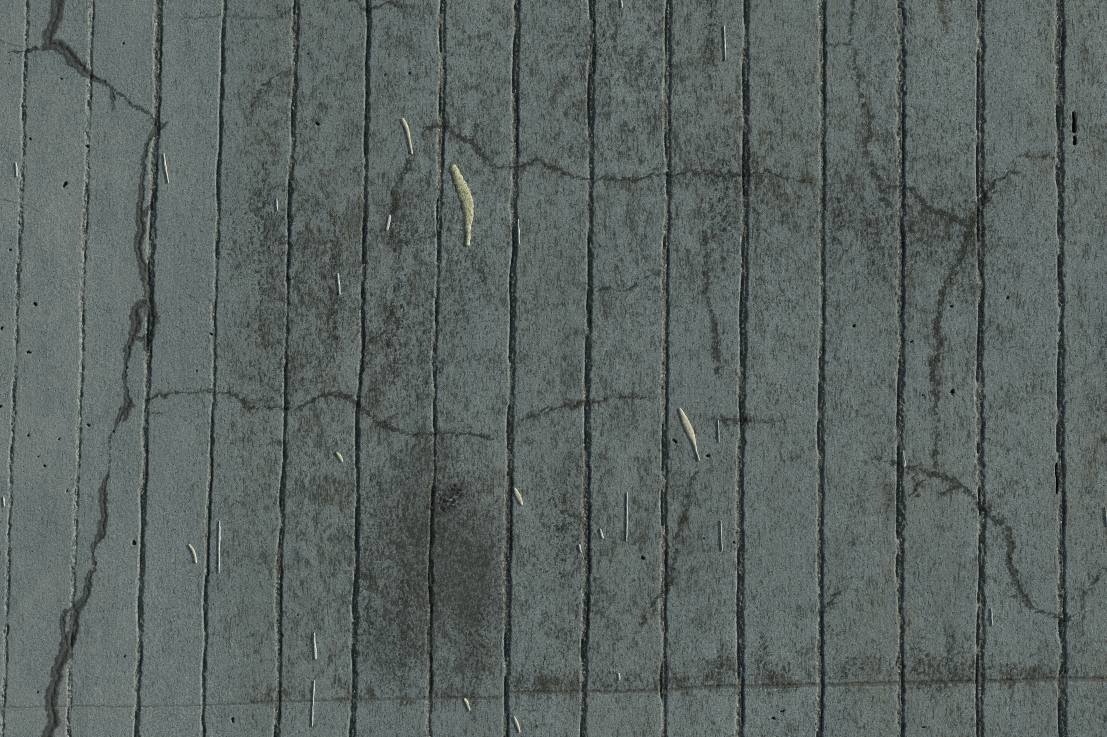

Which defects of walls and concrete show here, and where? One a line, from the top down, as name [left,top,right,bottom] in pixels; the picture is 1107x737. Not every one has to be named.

crack [388,107,813,255]
crack [0,0,494,737]
crack [517,395,656,423]
crack [591,269,662,292]
crack [701,230,726,377]
crack [718,417,786,431]
crack [829,0,1107,623]
crack [640,471,699,628]
crack [820,590,842,613]